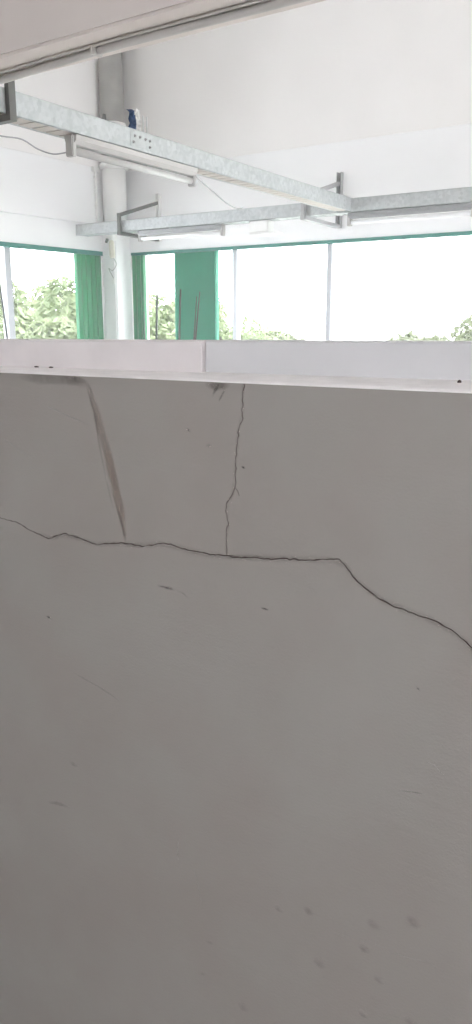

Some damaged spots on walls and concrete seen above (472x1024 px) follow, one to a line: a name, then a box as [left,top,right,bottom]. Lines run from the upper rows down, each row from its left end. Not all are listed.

crack [1,383,472,649]